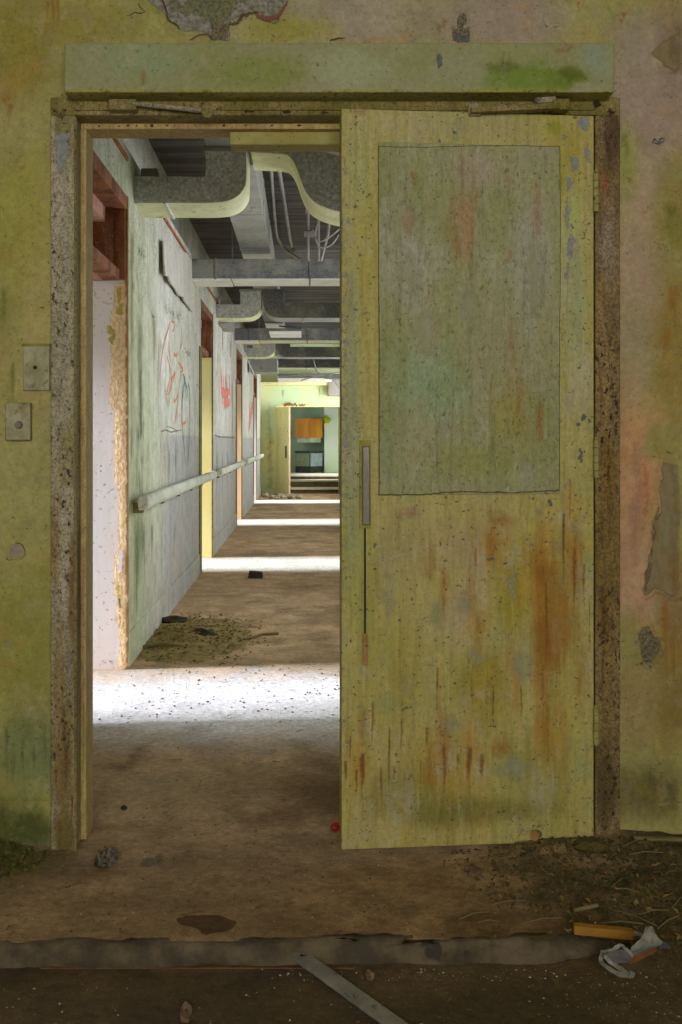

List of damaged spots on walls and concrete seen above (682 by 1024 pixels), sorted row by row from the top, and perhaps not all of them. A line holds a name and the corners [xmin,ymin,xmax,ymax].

peeling [142,0,292,43]
peeling [564,144,591,280]
peeling [638,451,682,602]